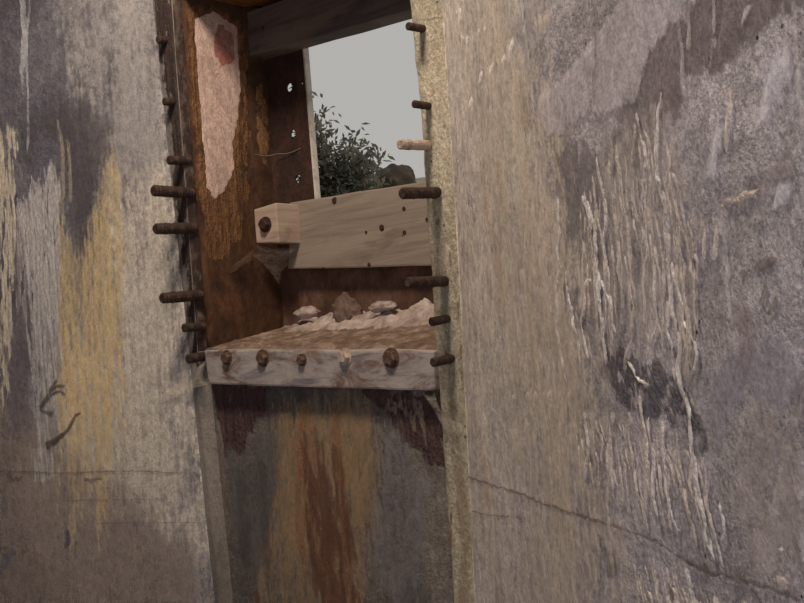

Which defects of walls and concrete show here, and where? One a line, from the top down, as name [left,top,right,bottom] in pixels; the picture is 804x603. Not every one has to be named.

leakage [0,0,208,603]
corrosion [154,0,185,187]
corrosion [174,197,188,223]
corrosion [181,234,193,291]
corrosion [186,301,199,368]
corrosion [184,5,251,261]
peeling [195,11,241,198]
peeling [256,85,269,166]
leakage [446,0,804,603]
corrosion [293,404,360,603]
crack [468,476,800,603]